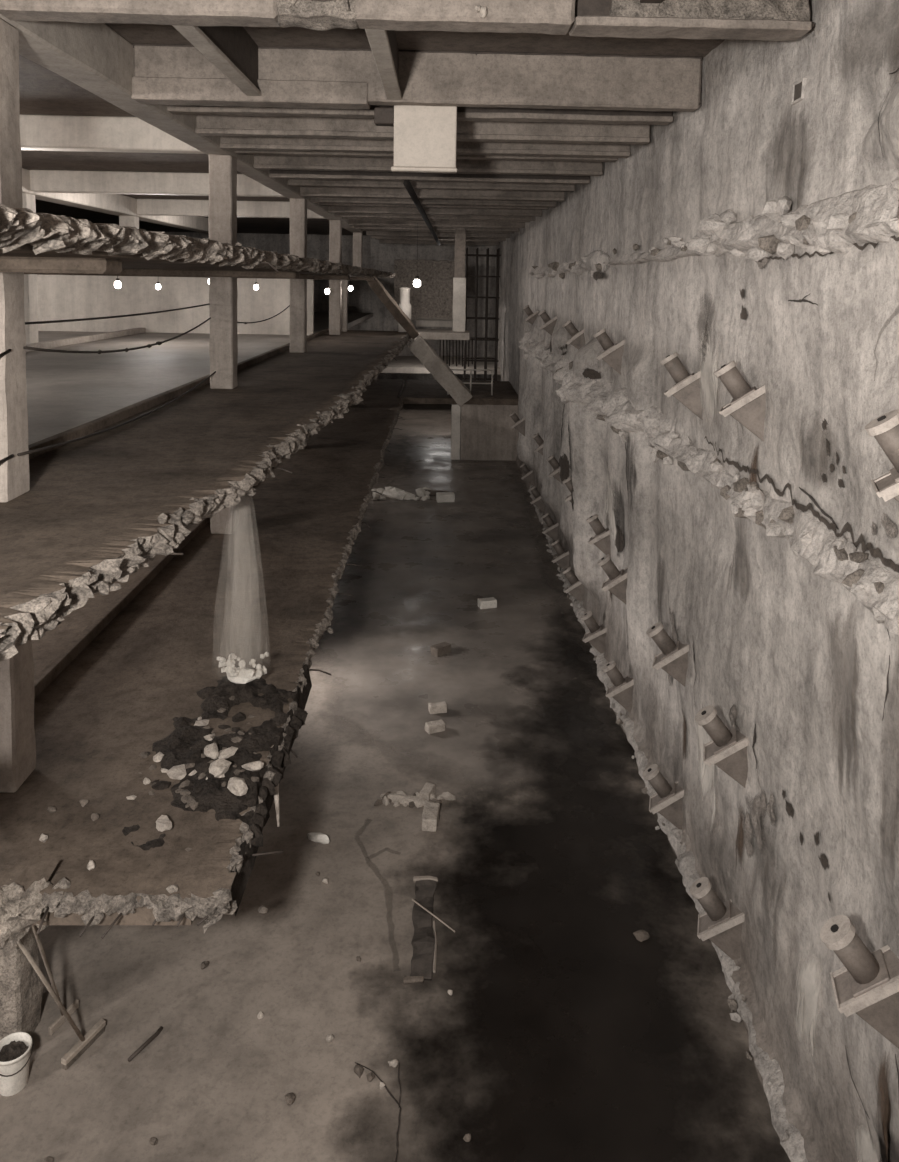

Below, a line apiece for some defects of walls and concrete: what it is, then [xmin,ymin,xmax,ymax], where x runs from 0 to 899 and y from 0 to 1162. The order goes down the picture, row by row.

peeling [532,254,606,279]
spalling [740,289,748,320]
peeling [633,195,857,269]
spalling [0,332,411,669]
crack [704,436,899,573]
spalling [257,398,405,781]
spalling [0,796,283,948]
water stain [396,616,788,1162]
water stain [796,960,819,1050]